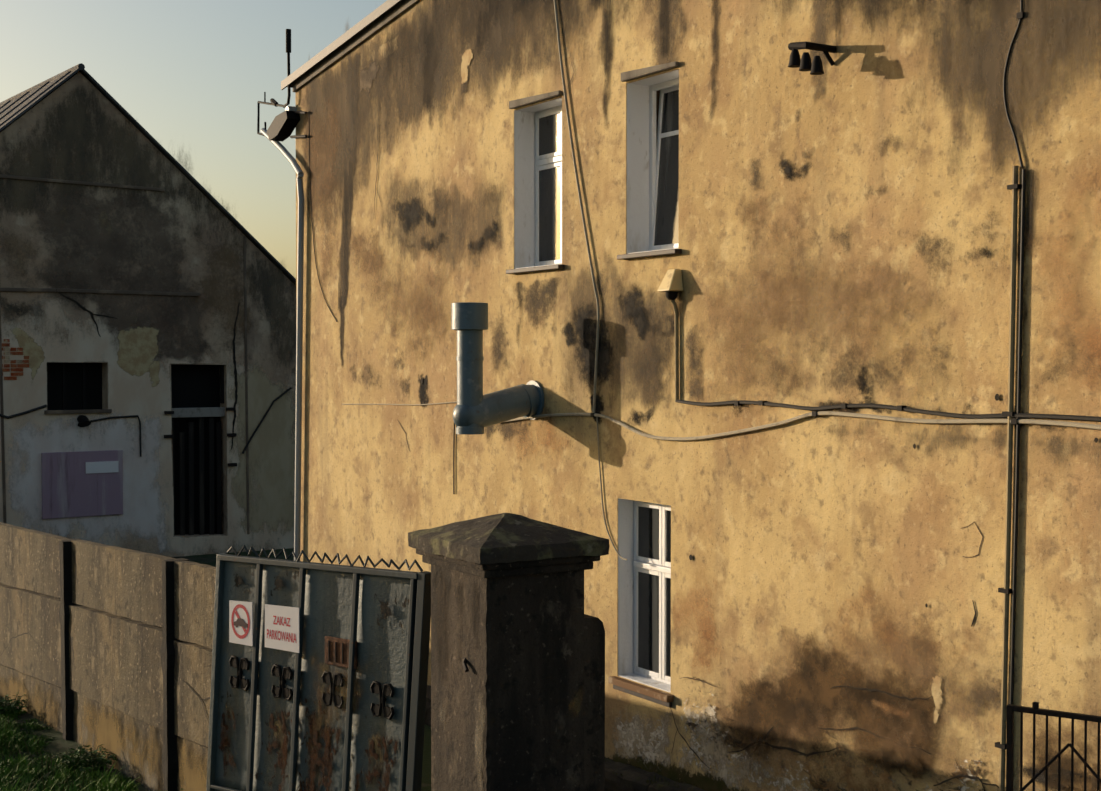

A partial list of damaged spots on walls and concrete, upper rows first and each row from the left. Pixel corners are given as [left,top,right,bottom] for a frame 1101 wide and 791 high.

water stain [589,0,612,116]
water stain [654,0,686,65]
water stain [810,0,840,96]
water stain [779,154,810,180]
water stain [322,141,501,370]
flaking render [2,339,29,380]
crack [58,292,117,337]
crack [231,303,240,450]
water stain [400,376,429,407]
water stain [562,262,675,425]
water stain [613,624,1001,791]
crack [670,707,999,791]